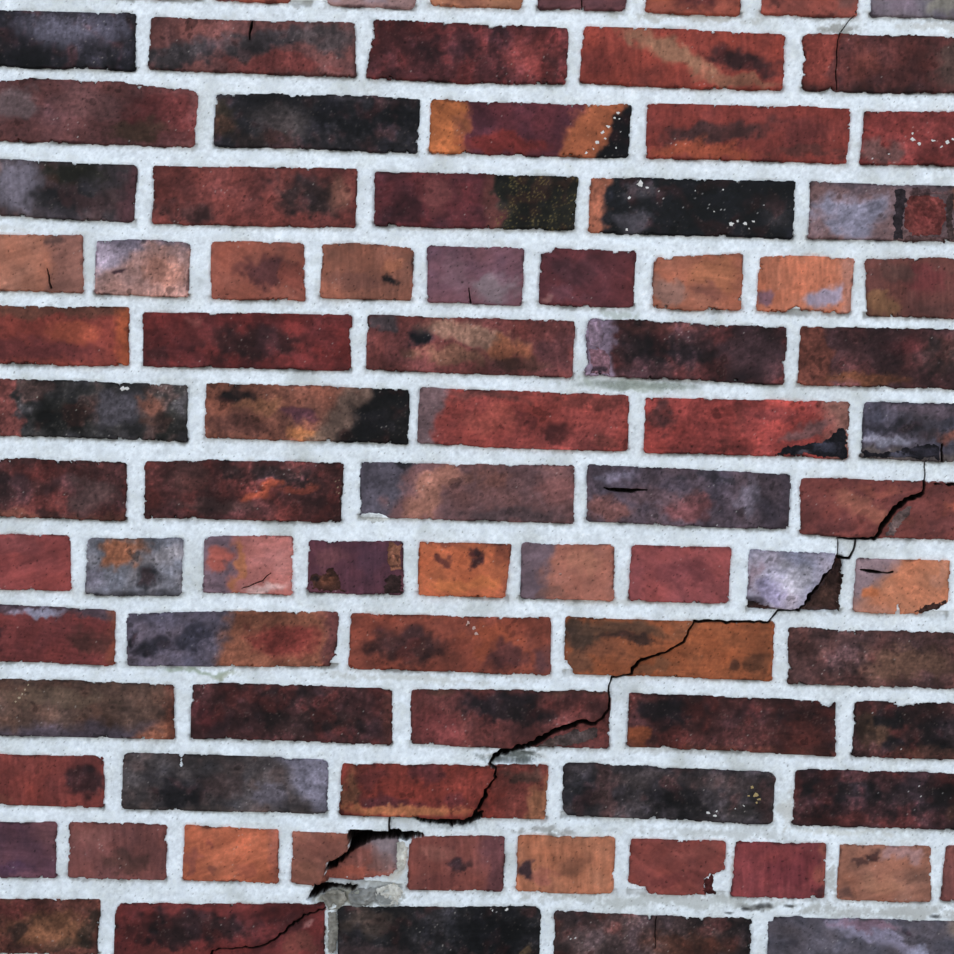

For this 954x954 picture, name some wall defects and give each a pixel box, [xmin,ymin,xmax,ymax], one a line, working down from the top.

spalling [805,560,844,611]
crack [208,442,954,954]
spalling [322,841,408,953]